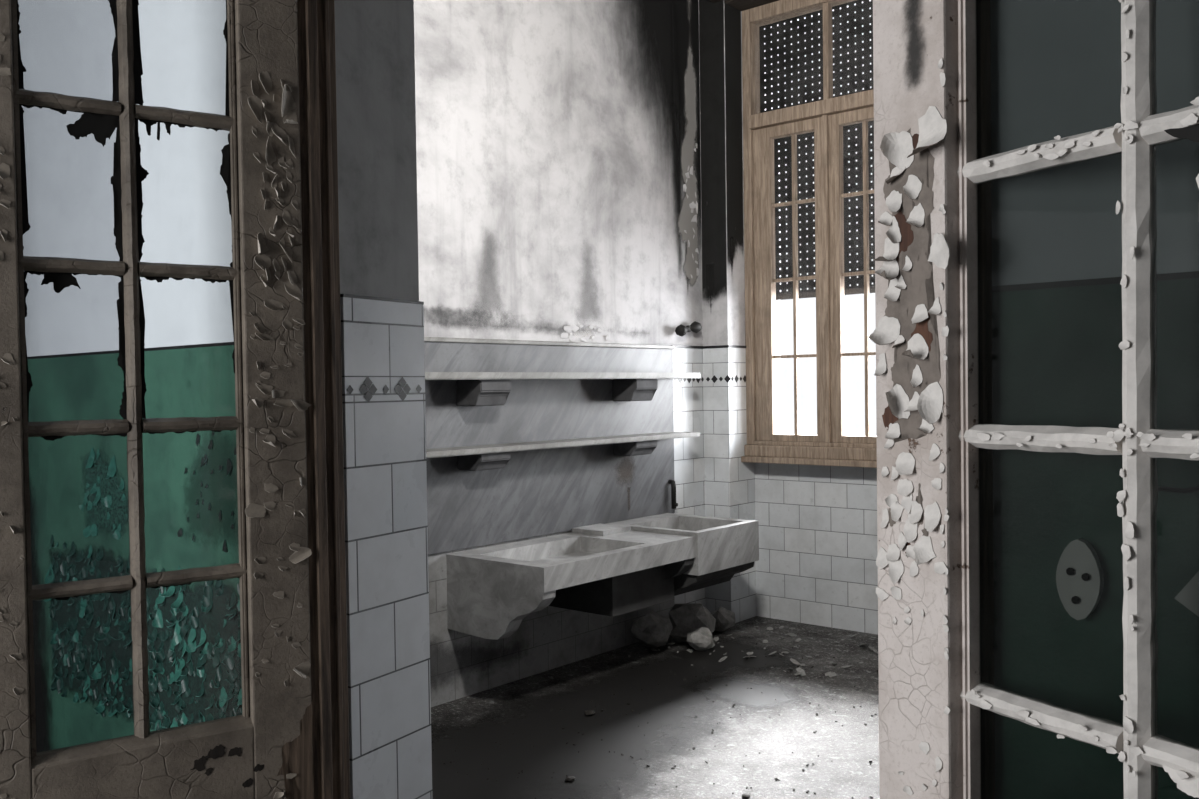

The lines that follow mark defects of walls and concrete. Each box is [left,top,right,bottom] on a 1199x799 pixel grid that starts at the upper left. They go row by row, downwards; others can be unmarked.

leakage [671,2,687,263]
leakage [687,0,743,306]
peeling [1017,120,1139,160]
peeling [1164,97,1199,143]
peeling [248,71,311,447]
leakage [431,307,485,326]
peeling [869,106,950,625]
peeling [1087,424,1156,561]
peeling [972,689,992,709]
peeling [1017,710,1040,725]
peeling [1078,716,1144,778]
peeling [1162,765,1199,798]